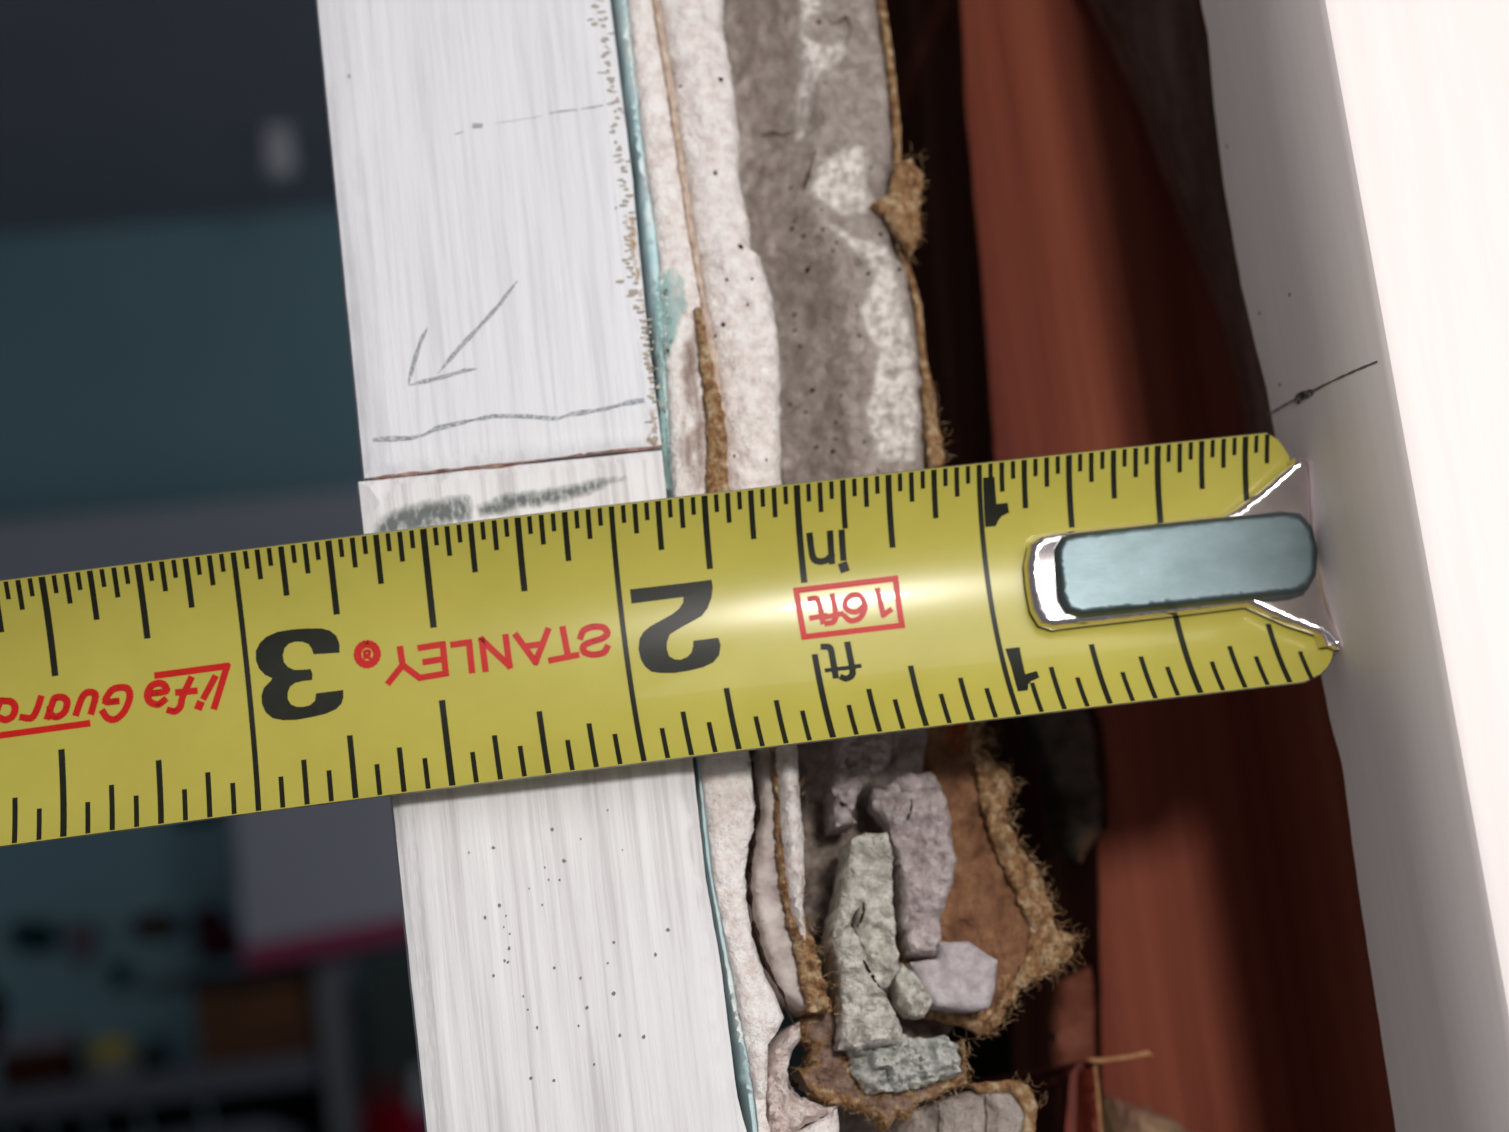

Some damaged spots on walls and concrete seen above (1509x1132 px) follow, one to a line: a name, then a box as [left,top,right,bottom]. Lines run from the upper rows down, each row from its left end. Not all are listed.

crack [934,1097,942,1132]
crack [982,1093,990,1132]